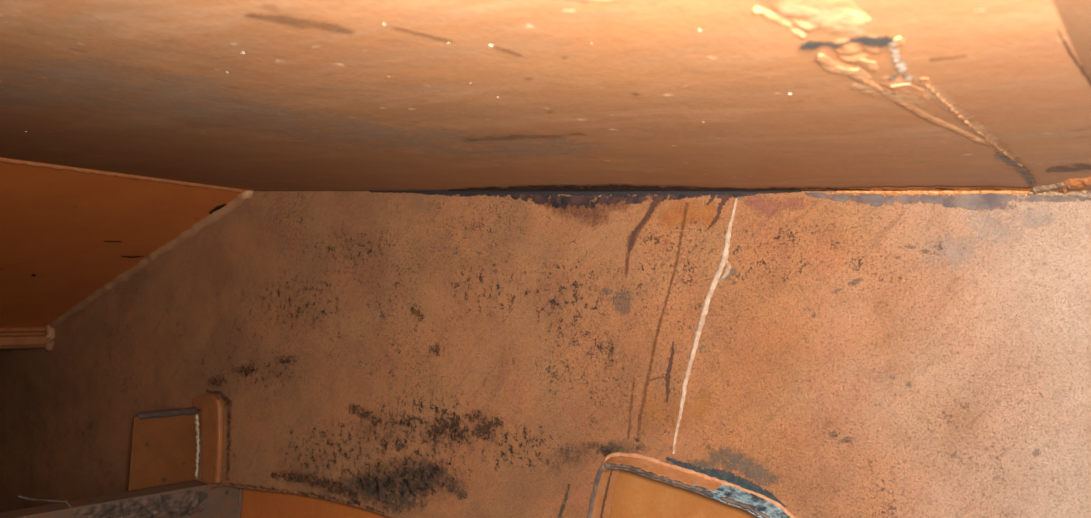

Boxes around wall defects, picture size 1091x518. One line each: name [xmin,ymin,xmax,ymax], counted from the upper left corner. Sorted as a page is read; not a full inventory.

crack [800,35,932,105]
rust [628,203,688,449]